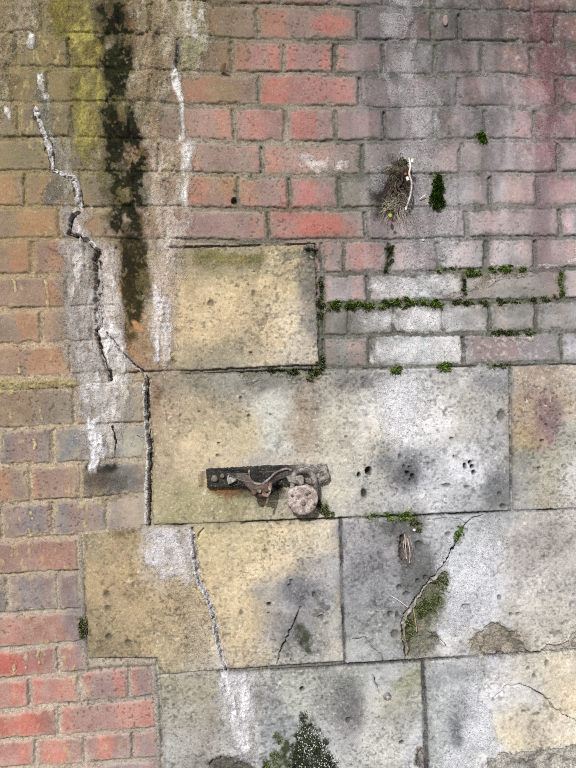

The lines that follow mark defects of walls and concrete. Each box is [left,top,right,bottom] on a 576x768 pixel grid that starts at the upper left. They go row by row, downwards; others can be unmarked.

damp [0,0,47,123]
damp [31,0,216,474]
crack [32,106,155,526]
spalling [497,408,508,423]
crack [188,528,227,671]
crack [401,514,483,656]
spalling [467,612,576,668]
crack [495,683,572,718]